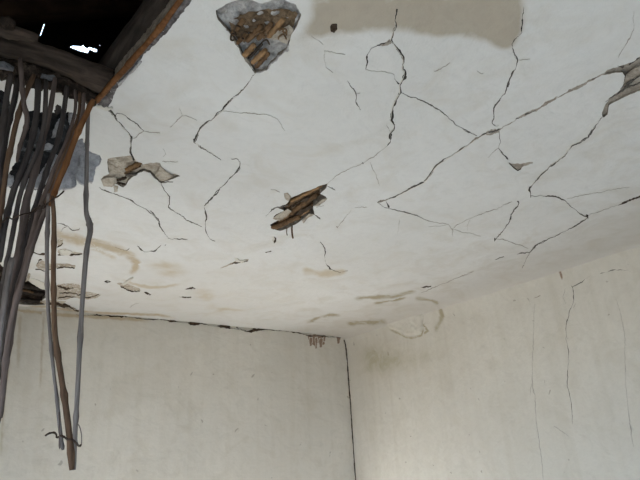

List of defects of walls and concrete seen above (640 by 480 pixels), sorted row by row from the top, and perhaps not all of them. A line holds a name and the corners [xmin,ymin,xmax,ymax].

spalling [216,0,300,73]
leakage [293,0,531,53]
spalling [602,57,640,118]
spalling [101,155,177,192]
crack [99,75,283,252]
crack [327,9,629,268]
spalling [266,185,335,243]
leakage [49,225,263,313]
rust [308,334,326,349]
leakage [304,312,388,328]
leakage [351,288,448,388]
crack [76,303,356,480]